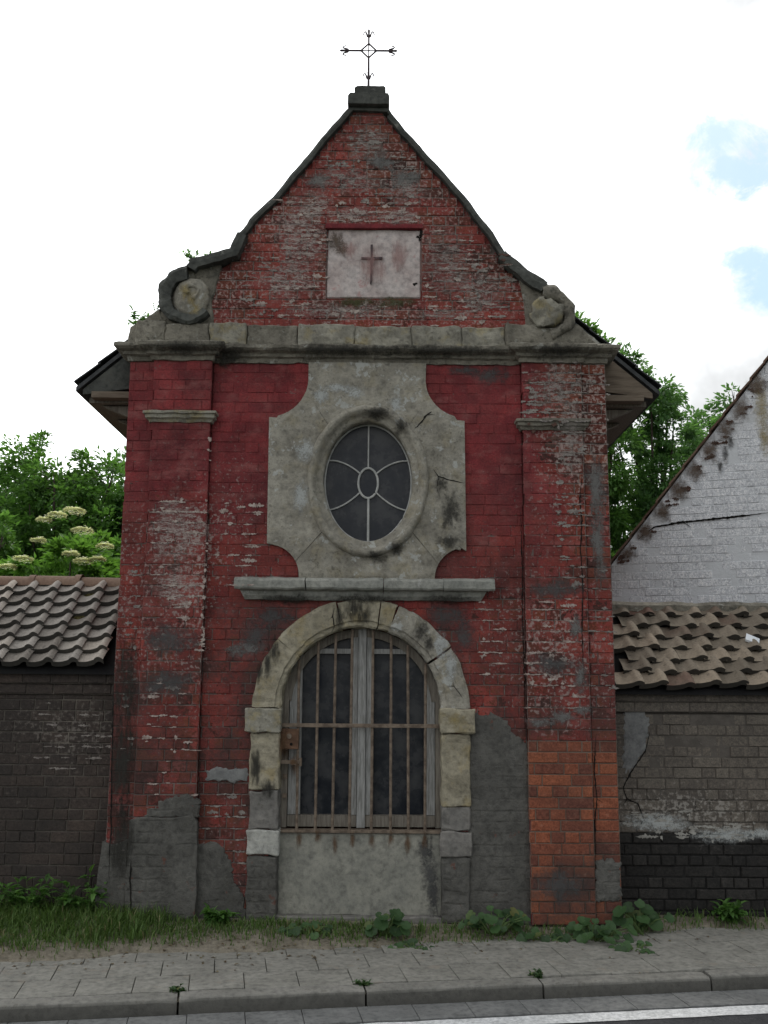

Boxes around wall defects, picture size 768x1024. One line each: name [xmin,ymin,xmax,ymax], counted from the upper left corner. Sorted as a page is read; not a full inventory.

peeling [240,129,444,325]
peeling [519,361,610,466]
damp [658,375,767,520]
peeling [130,498,264,651]
peeling [524,479,619,709]
crack [639,513,762,539]
peeling [192,793,246,864]
damp [251,753,272,795]
crack [623,733,657,830]
damp [633,816,686,830]
damp [699,829,768,841]